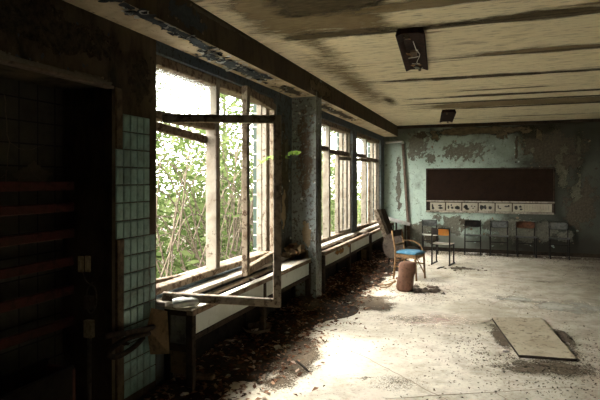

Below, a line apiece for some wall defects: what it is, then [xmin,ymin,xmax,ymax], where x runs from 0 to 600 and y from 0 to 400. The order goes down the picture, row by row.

peeling [98,0,309,96]
leakage [224,0,600,104]
peeling [394,131,494,212]
peeling [406,213,579,248]